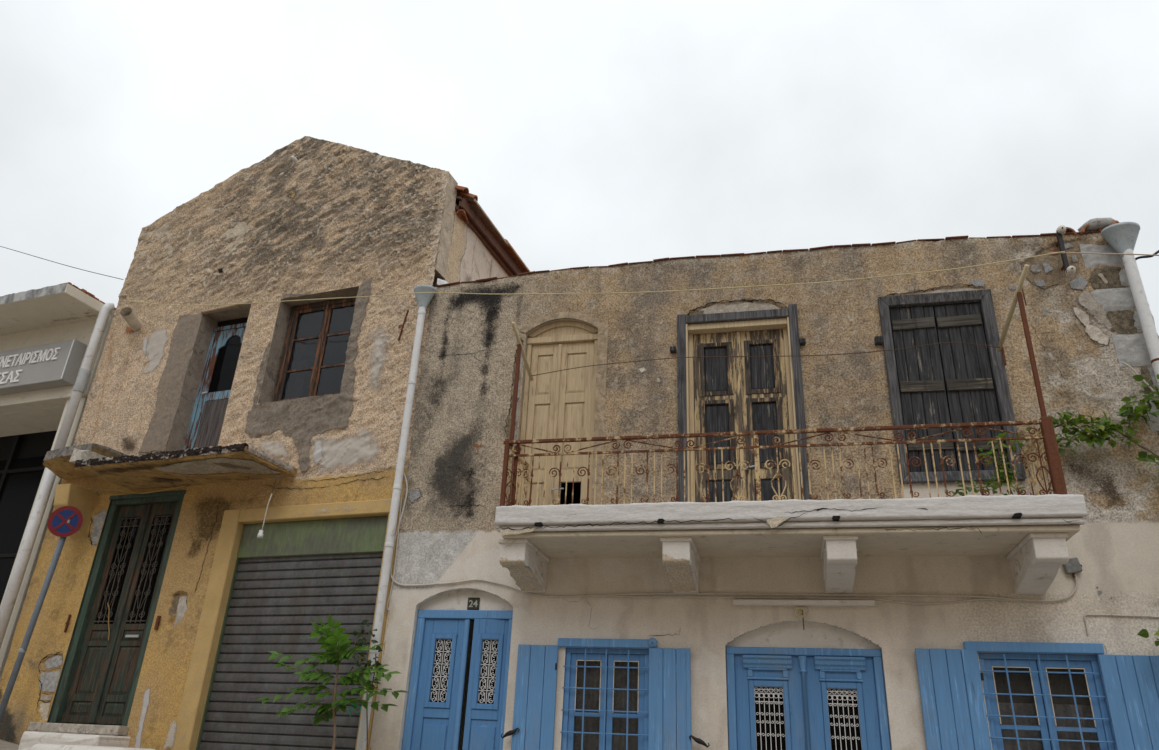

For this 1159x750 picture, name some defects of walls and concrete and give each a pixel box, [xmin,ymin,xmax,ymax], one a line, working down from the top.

spalling [1020,238,1124,290]
peeling [143,328,168,374]
water stain [424,265,521,428]
spalling [1073,306,1137,370]
peeling [313,428,380,473]
water stain [429,420,484,517]
water stain [189,495,254,557]
spalling [37,651,63,720]